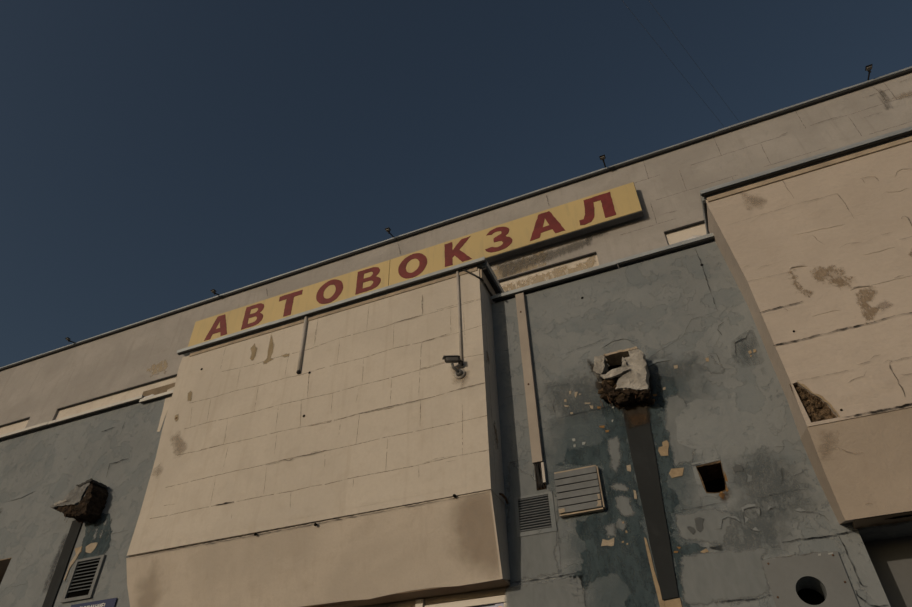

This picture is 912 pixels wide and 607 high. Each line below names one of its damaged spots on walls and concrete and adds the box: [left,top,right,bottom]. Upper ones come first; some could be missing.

peeling [493,240,596,291]
peeling [789,263,878,320]
crack [773,312,912,346]
spalling [790,381,840,423]
peeling [505,377,656,607]